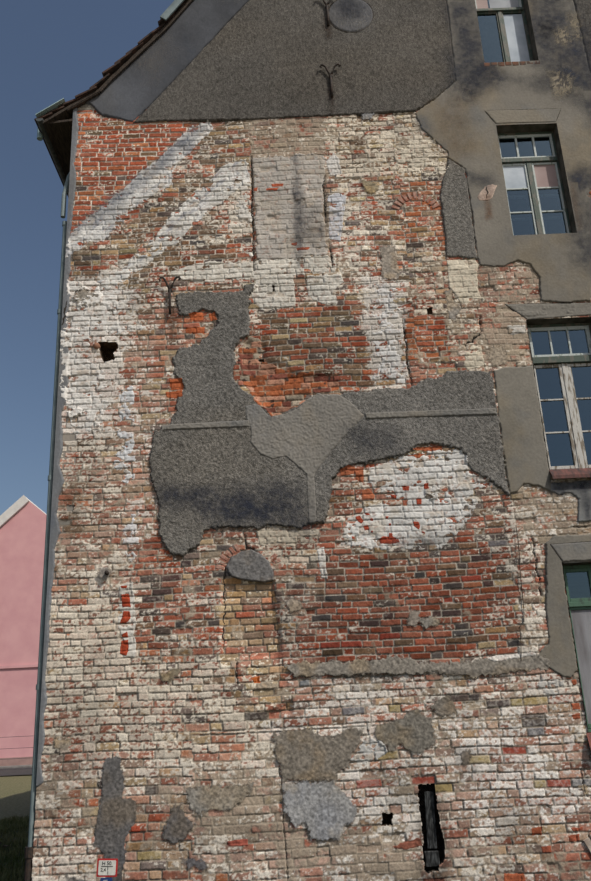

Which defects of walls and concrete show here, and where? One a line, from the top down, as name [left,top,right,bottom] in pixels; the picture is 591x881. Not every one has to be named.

flaking render [85,0,591,304]
flaking render [165,153,344,425]
peeling [367,281,402,335]
peeling [507,325,526,335]
peeling [36,108,251,787]
flaking render [149,339,591,557]
crack [222,567,238,684]
peeling [317,547,328,579]
flaking render [488,534,591,698]
peeling [351,738,388,763]